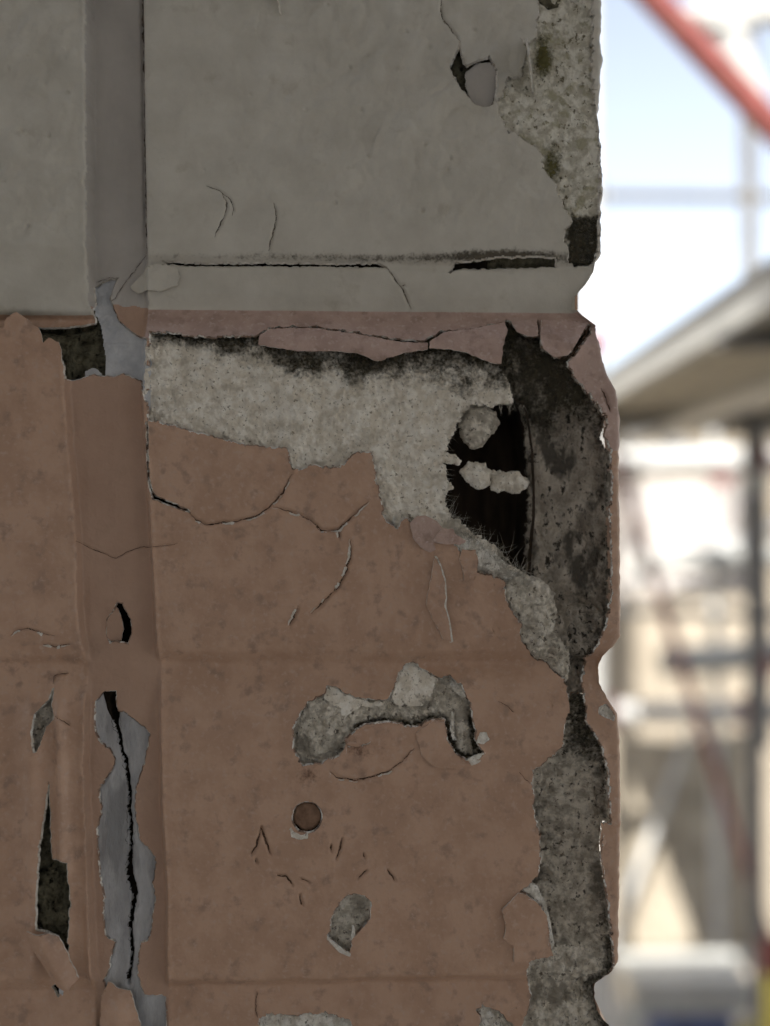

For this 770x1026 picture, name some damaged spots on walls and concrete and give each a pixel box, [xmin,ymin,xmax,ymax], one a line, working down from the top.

crack [96,0,411,308]
crack [450,258,555,273]
flaking render [454,0,600,262]
crack [149,479,369,626]
flaking render [144,319,615,1026]
peeling [100,981,141,1026]